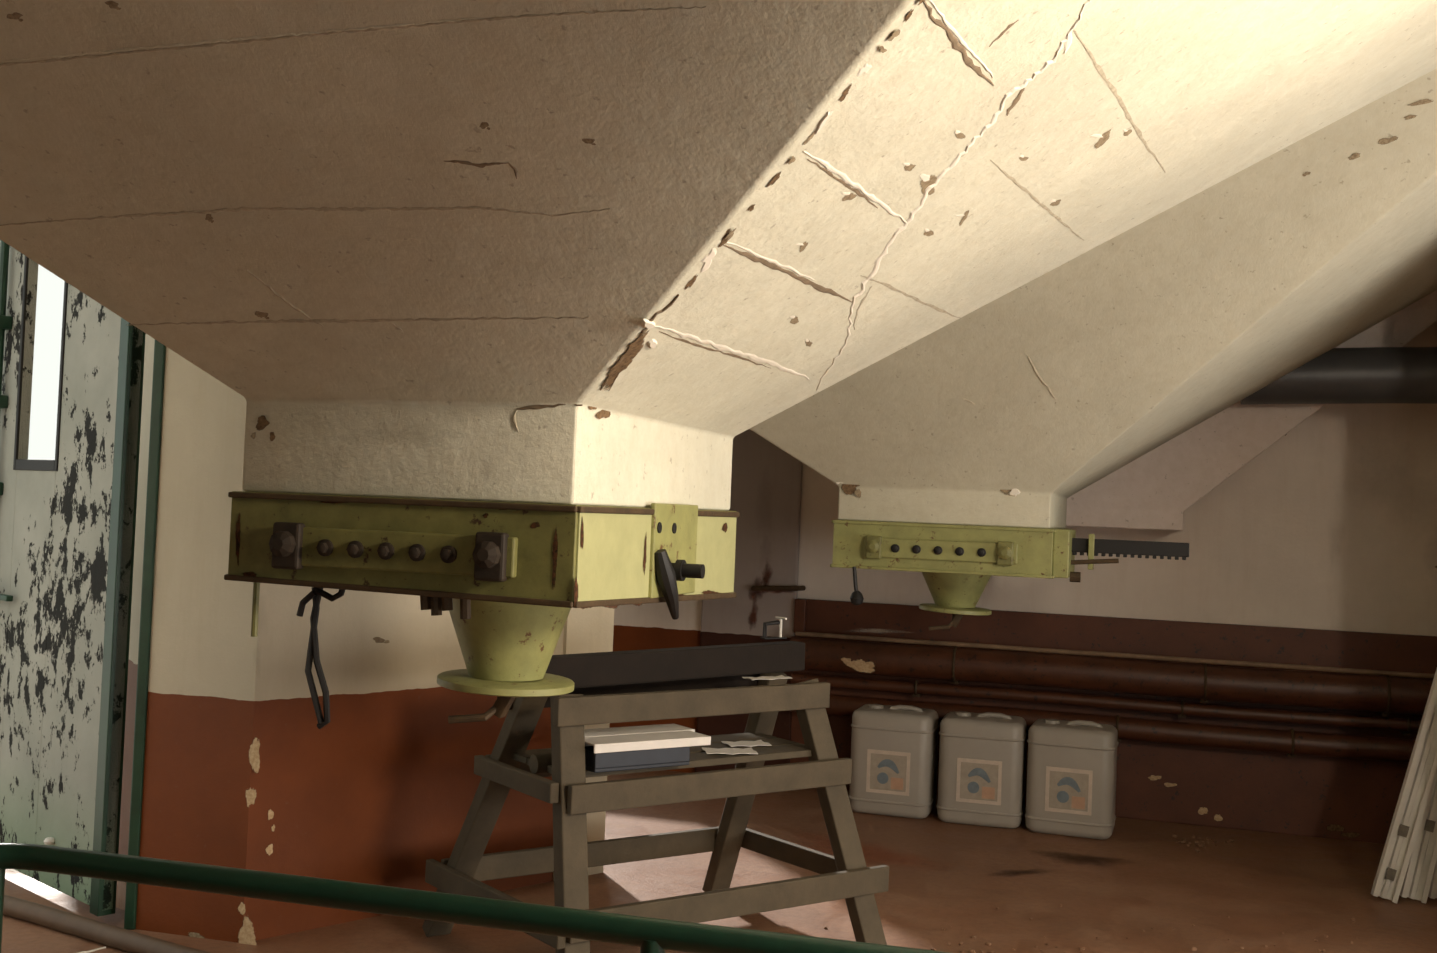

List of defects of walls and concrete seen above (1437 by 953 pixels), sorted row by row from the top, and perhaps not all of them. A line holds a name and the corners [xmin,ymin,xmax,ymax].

spalling [766,0,925,187]
crack [655,0,1165,391]
spalling [600,228,736,391]
spalling [588,406,611,419]
peeling [246,738,275,855]
peeling [238,902,257,945]